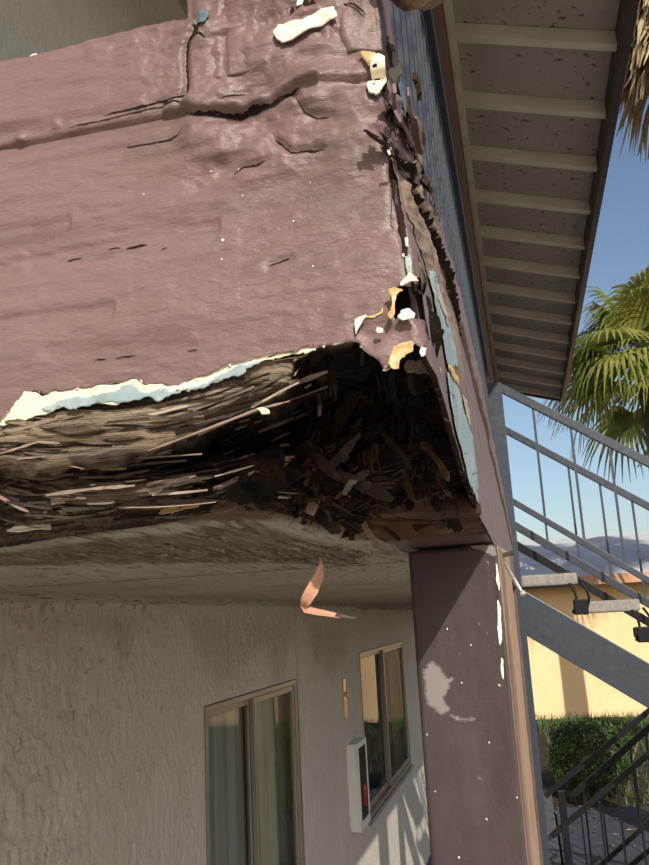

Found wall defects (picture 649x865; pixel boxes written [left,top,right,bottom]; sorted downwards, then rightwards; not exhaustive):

crack [289,0,316,16]
peeling [273,6,337,43]
peeling [360,35,402,96]
crack [73,24,330,147]
crack [275,140,322,153]
crack [234,161,265,174]
peeling [353,150,480,506]
peeling [0,348,316,427]
peeling [7,523,51,532]
peeling [158,504,199,514]
peeling [423,661,473,721]